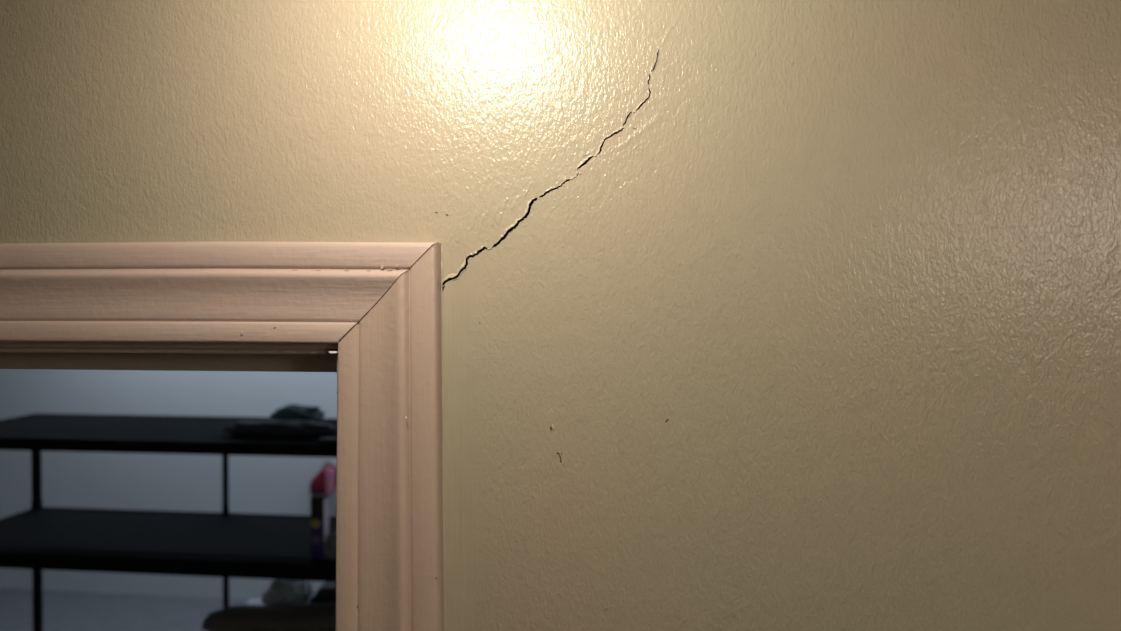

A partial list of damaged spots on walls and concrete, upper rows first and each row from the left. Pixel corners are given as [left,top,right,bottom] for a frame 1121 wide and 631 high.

crack [442,50,660,290]
crack [338,243,434,342]